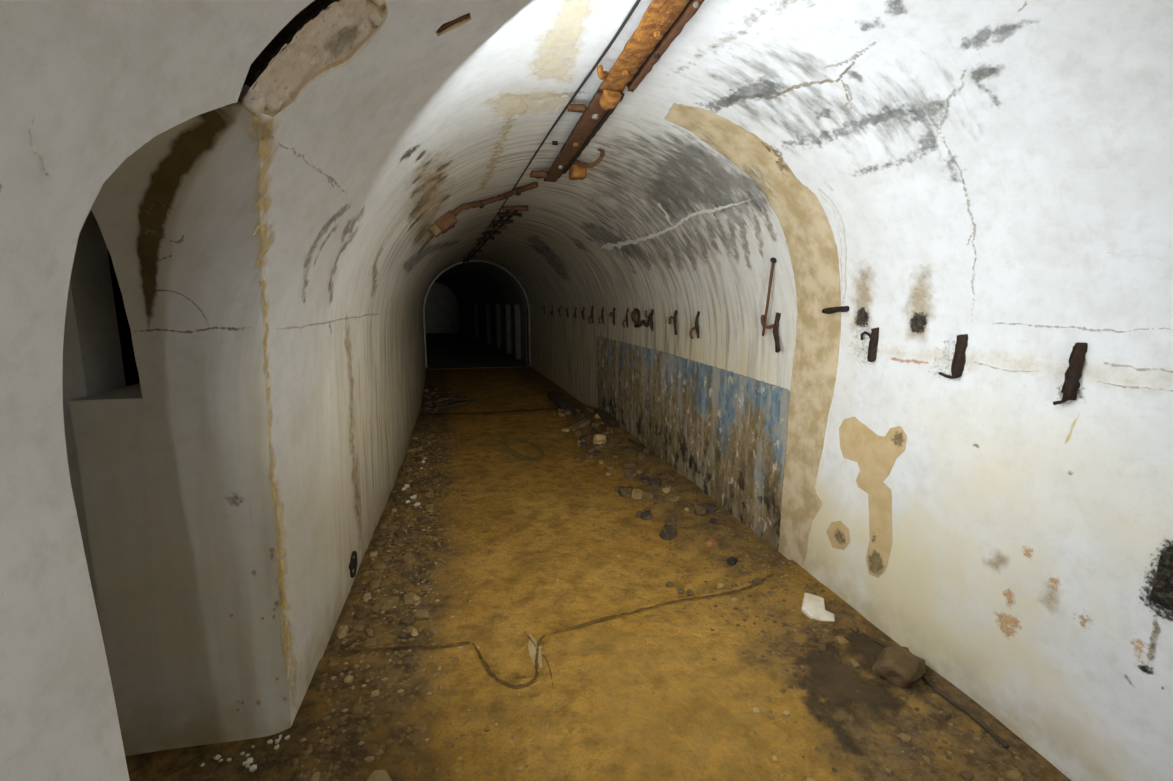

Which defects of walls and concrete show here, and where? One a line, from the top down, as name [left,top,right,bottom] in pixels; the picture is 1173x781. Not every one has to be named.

spalling [238,0,388,117]
leakage [708,70,943,171]
leakage [888,0,904,15]
leakage [971,67,999,104]
leakage [961,25,1020,49]
leakage [574,136,776,273]
crack [599,197,766,250]
crack [818,182,847,304]
crack [931,70,976,300]
flaking render [826,521,850,550]
flaking render [839,417,907,578]
spalling [1132,540,1173,674]